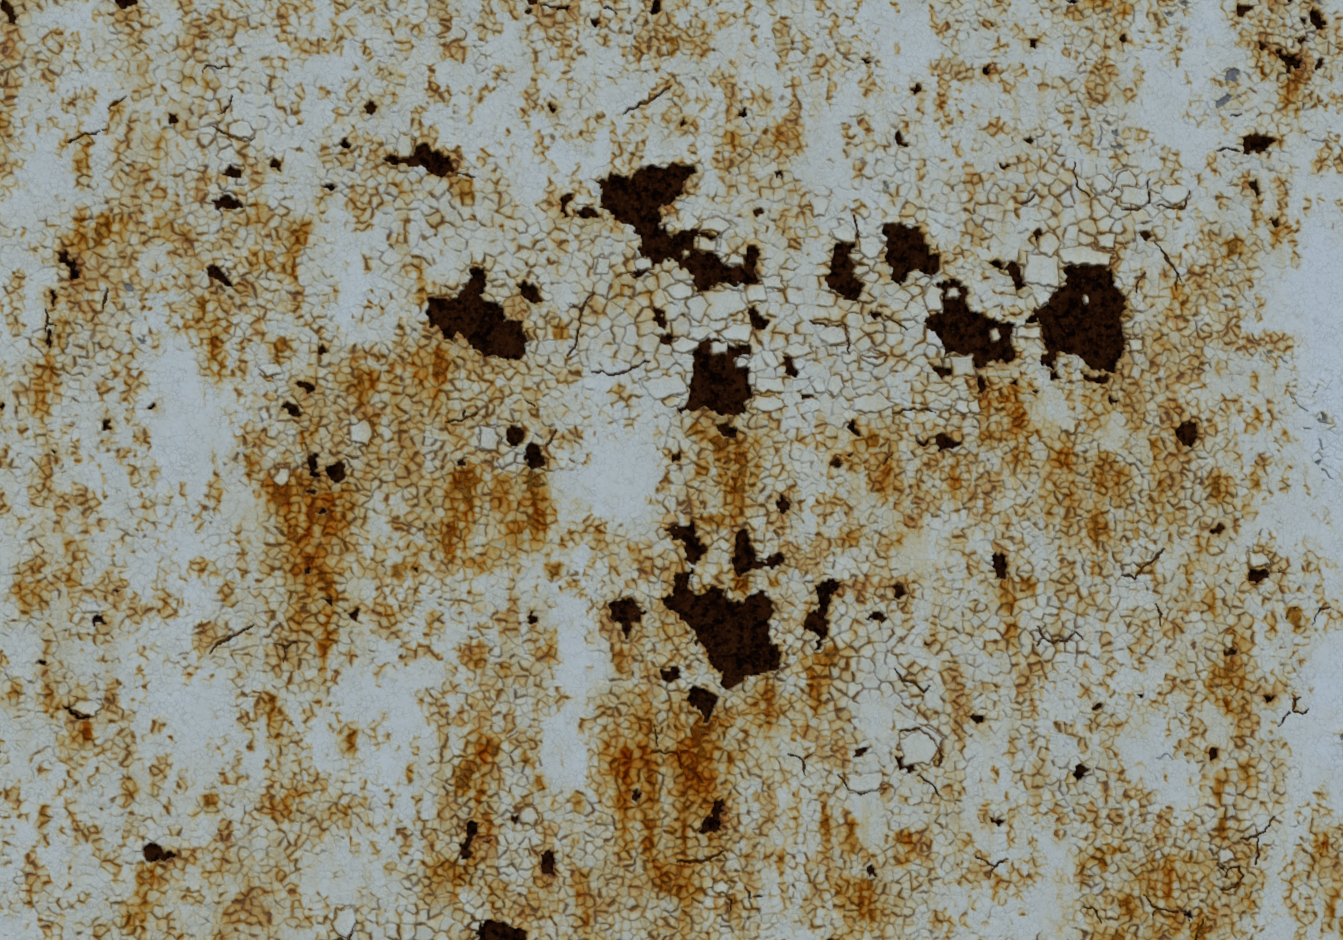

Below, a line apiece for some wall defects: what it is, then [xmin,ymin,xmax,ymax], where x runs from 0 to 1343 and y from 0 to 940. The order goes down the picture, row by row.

peeling [374,134,469,185]
crack [1073,125,1190,211]
corrosion [76,217,112,246]
peeling [415,251,554,370]
crack [567,293,651,376]
peeling [547,155,1143,461]
corrosion [440,468,478,550]
corrosion [519,473,547,531]
peeling [594,480,845,733]
crack [1121,549,1166,627]
corrosion [681,718,716,772]
crack [1220,816,1276,891]